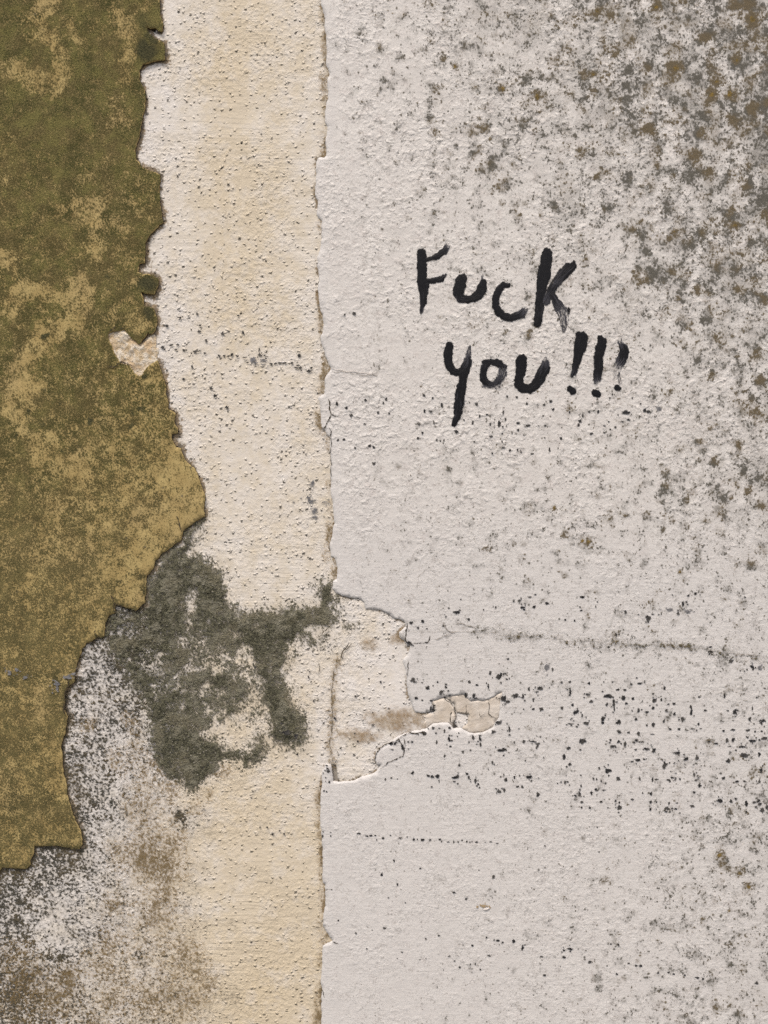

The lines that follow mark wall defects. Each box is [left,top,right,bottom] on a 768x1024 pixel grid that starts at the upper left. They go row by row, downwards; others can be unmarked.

peeling [569,397,662,435]
peeling [0,0,554,1024]
damp [341,0,768,1024]
peeling [624,592,697,623]
damp [0,515,360,1024]
peeling [557,677,707,814]
peeling [708,695,768,814]